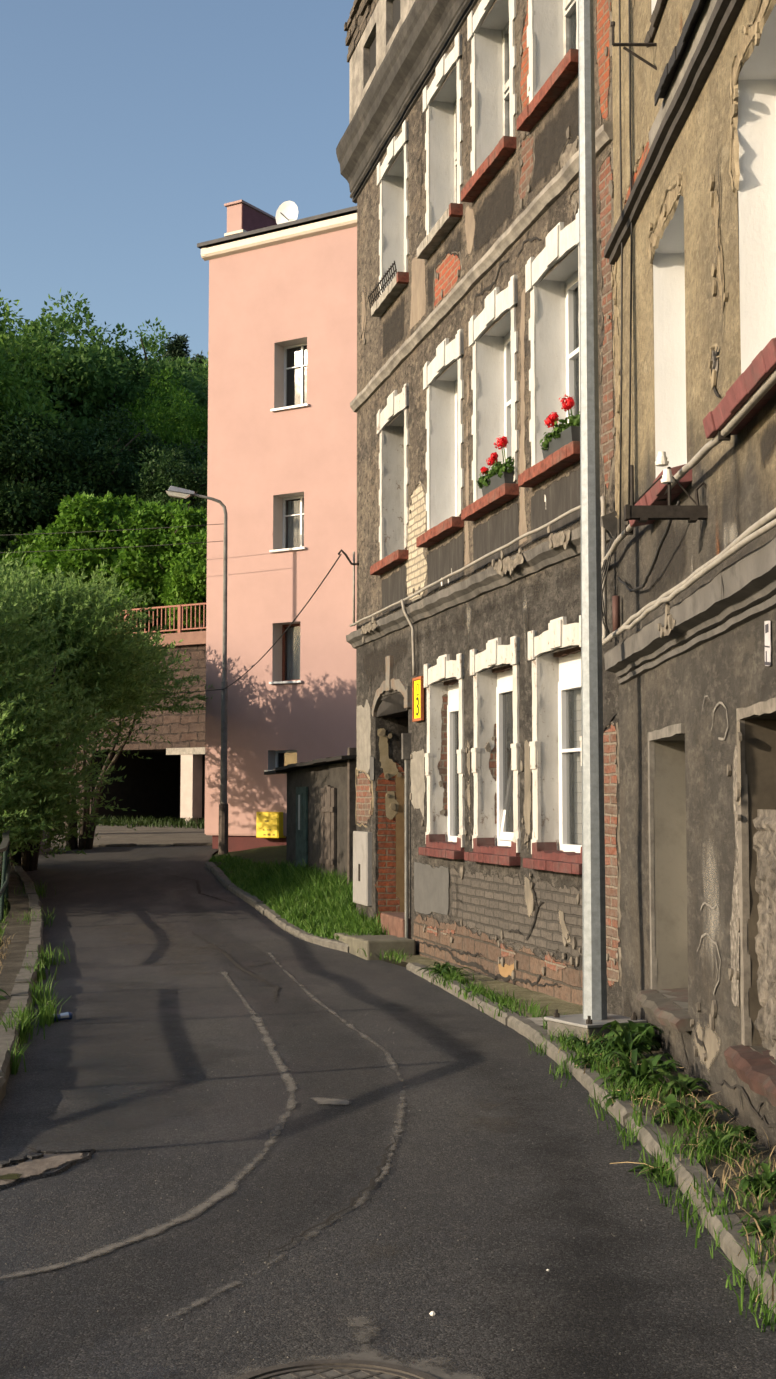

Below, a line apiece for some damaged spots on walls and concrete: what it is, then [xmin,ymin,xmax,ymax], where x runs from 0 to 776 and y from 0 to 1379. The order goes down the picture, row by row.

flaking render [410,206,475,330]
flaking render [648,173,686,264]
flaking render [708,343,720,390]
flaking render [404,482,427,603]
flaking render [355,694,583,1006]